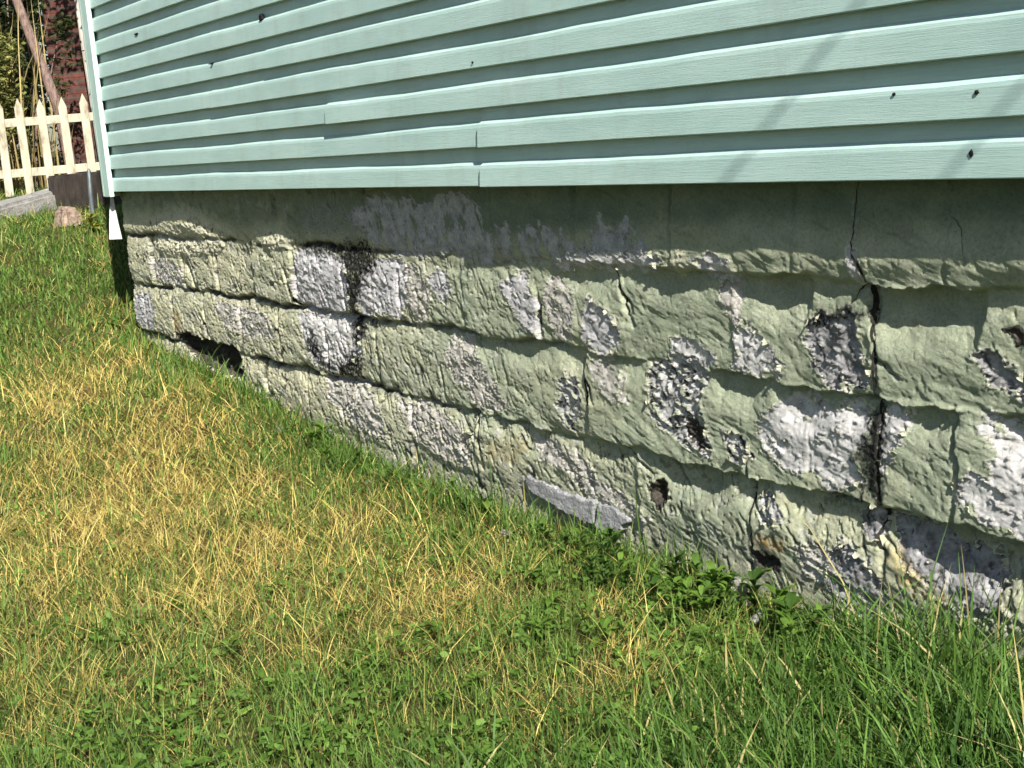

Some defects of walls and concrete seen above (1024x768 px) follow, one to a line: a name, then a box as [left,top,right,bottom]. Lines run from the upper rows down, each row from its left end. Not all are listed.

spalling [176,298,276,379]
water stain [298,204,379,384]
peeling [290,190,662,439]
crack [616,271,634,321]
peeling [688,251,785,381]
peeling [645,308,916,491]
crack [850,182,903,565]
spalling [861,408,1024,625]